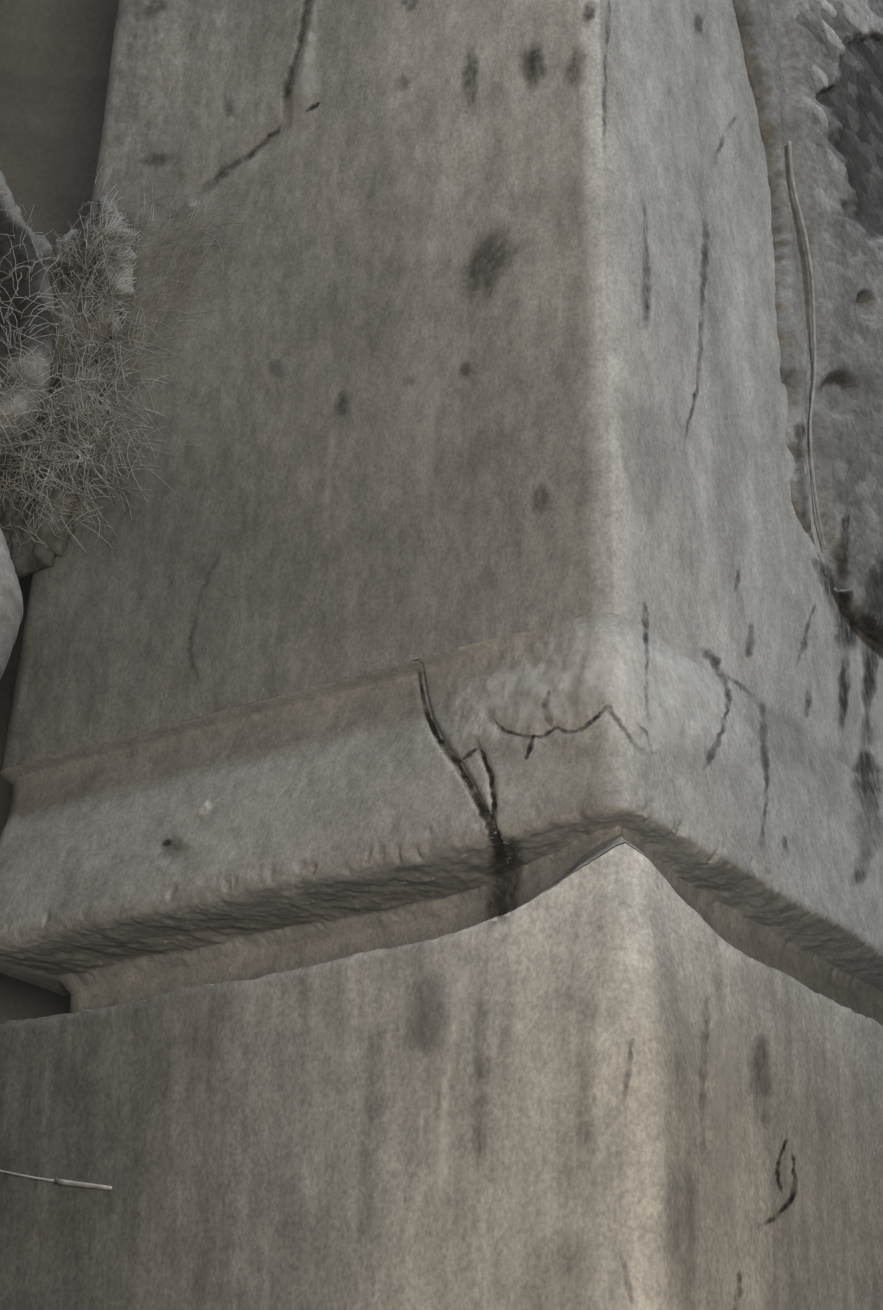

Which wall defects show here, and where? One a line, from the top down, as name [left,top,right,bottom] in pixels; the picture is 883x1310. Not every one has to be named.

crack [285,16,319,109]
crack [419,622,649,856]
crack [706,652,737,759]
crack [768,1140,796,1223]